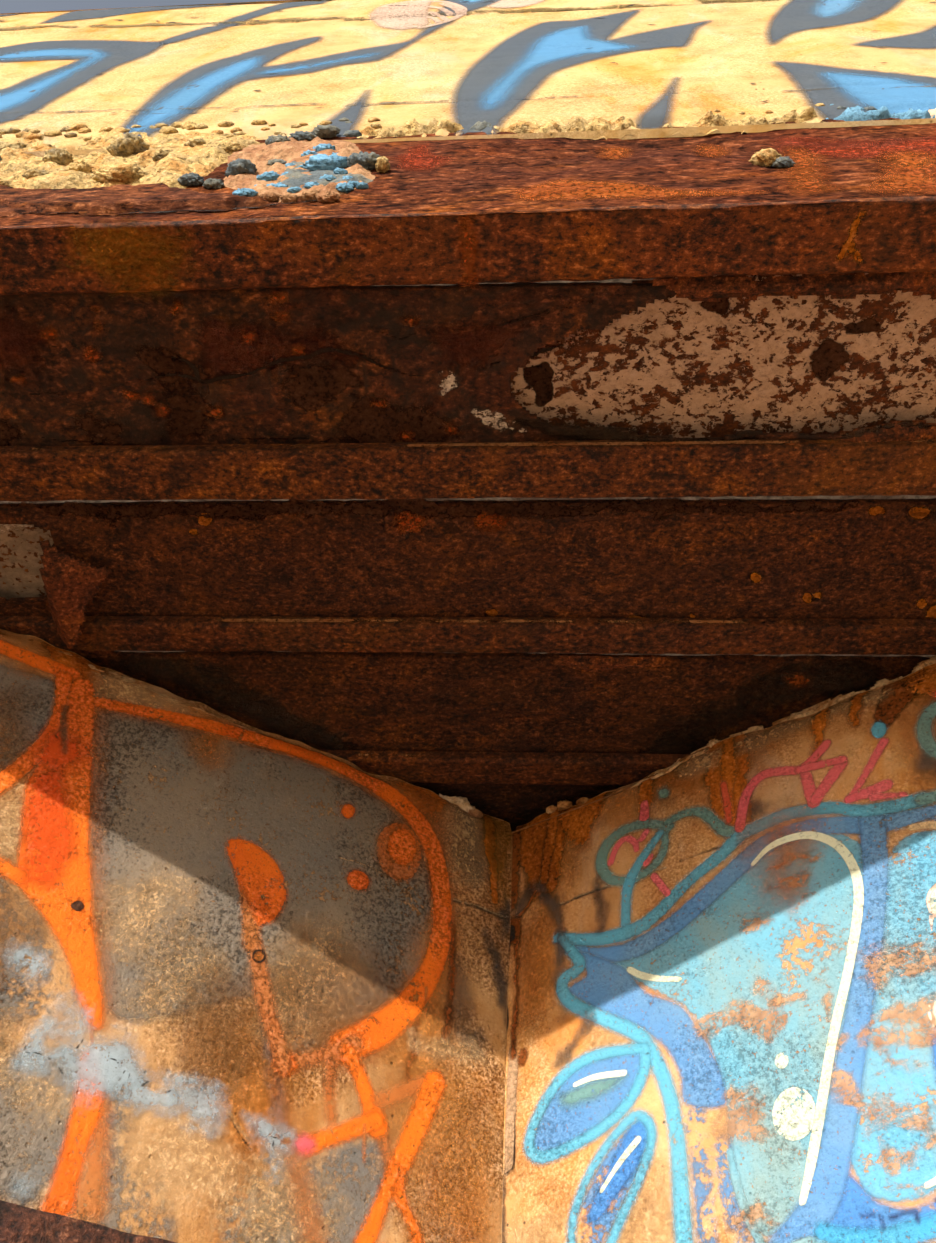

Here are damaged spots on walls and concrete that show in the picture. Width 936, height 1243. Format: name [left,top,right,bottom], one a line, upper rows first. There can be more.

peeling [0,183,316,218]
rust [516,180,764,201]
rust [774,136,936,192]
rust [653,211,936,302]
spalling [511,290,936,442]
spalling [0,524,54,599]
rust [39,540,112,701]
spalling [56,650,277,739]
spalling [607,655,936,795]
rust [848,664,936,752]
spalling [439,793,475,813]
rust [483,768,677,1066]